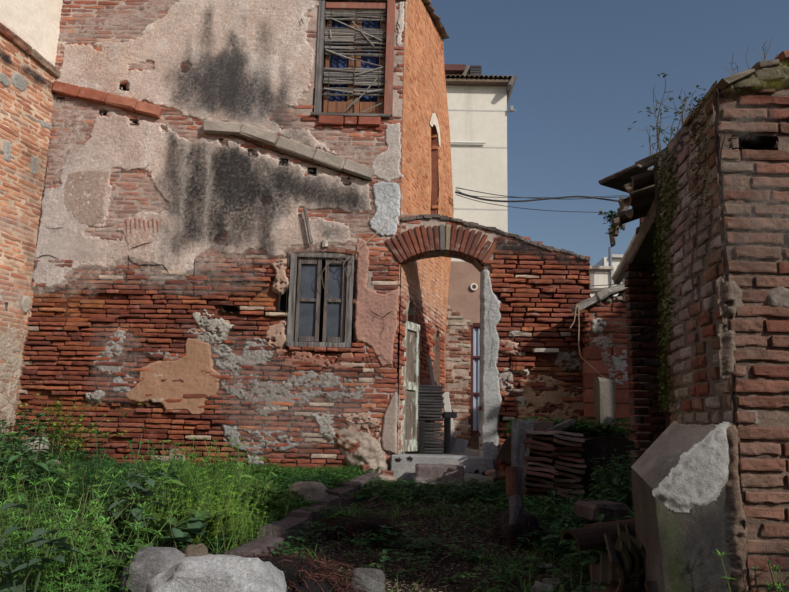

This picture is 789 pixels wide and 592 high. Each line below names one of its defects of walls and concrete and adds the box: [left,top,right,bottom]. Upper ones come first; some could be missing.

damp [173,34,285,125]
flaking render [396,1,408,46]
flaking render [31,0,404,322]
damp [166,135,365,254]
flaking render [0,323,146,439]